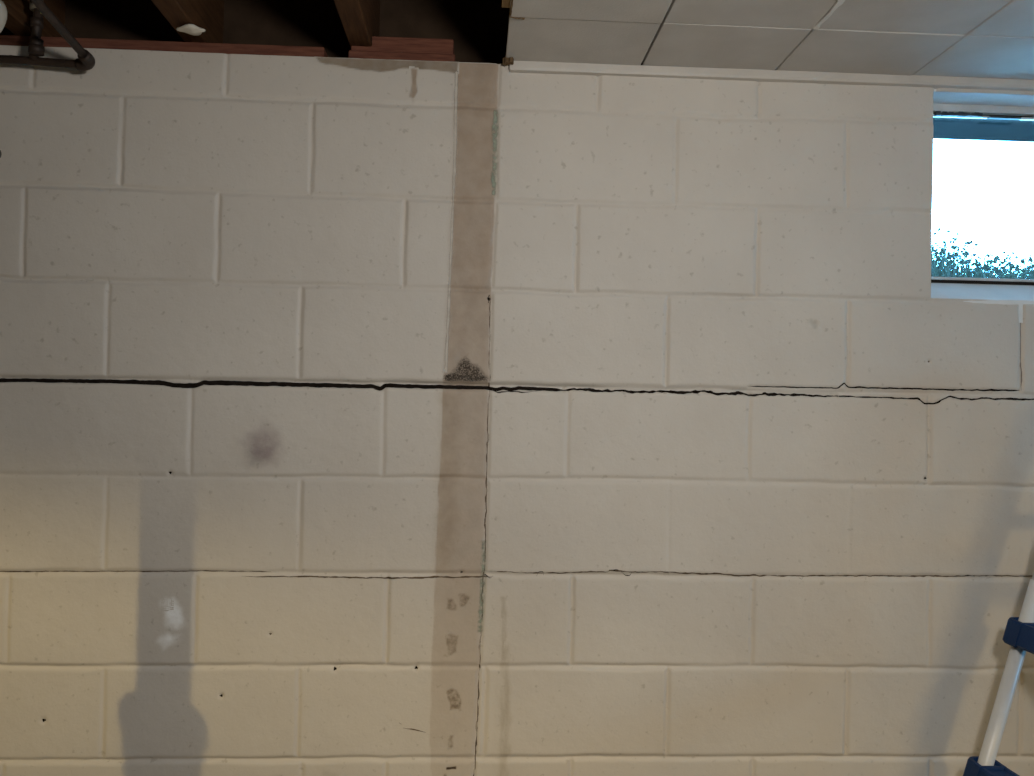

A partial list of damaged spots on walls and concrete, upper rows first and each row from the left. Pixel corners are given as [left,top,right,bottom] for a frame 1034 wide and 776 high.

leakage [445,359,484,381]
leakage [234,409,290,472]
crack [0,296,1034,776]